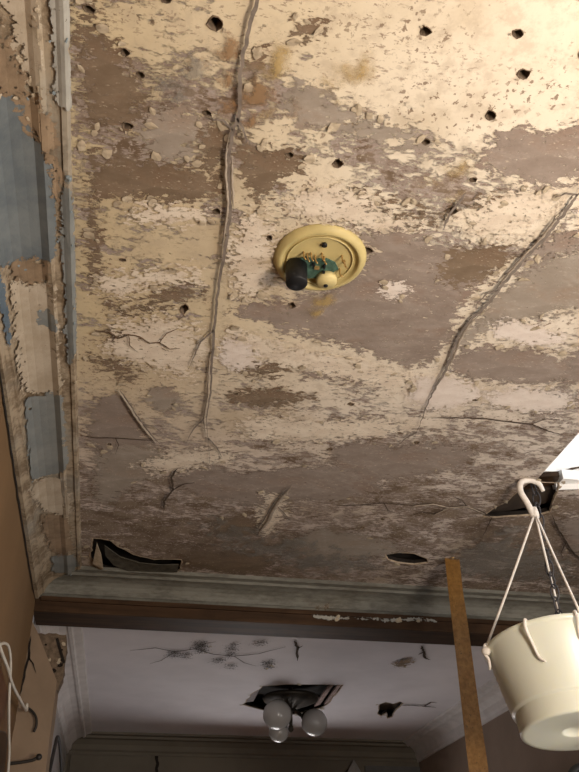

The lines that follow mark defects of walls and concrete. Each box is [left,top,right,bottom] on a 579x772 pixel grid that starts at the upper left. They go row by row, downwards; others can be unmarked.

peeling [280,11,333,47]
peeling [0,19,72,203]
peeling [65,0,318,287]
crack [85,0,259,463]
crack [398,192,579,446]
peeling [37,505,275,575]
crack [163,468,190,509]
damp [439,526,579,587]
spalling [482,471,579,569]
crack [552,515,579,562]
crack [139,641,302,665]
spalling [240,684,343,716]